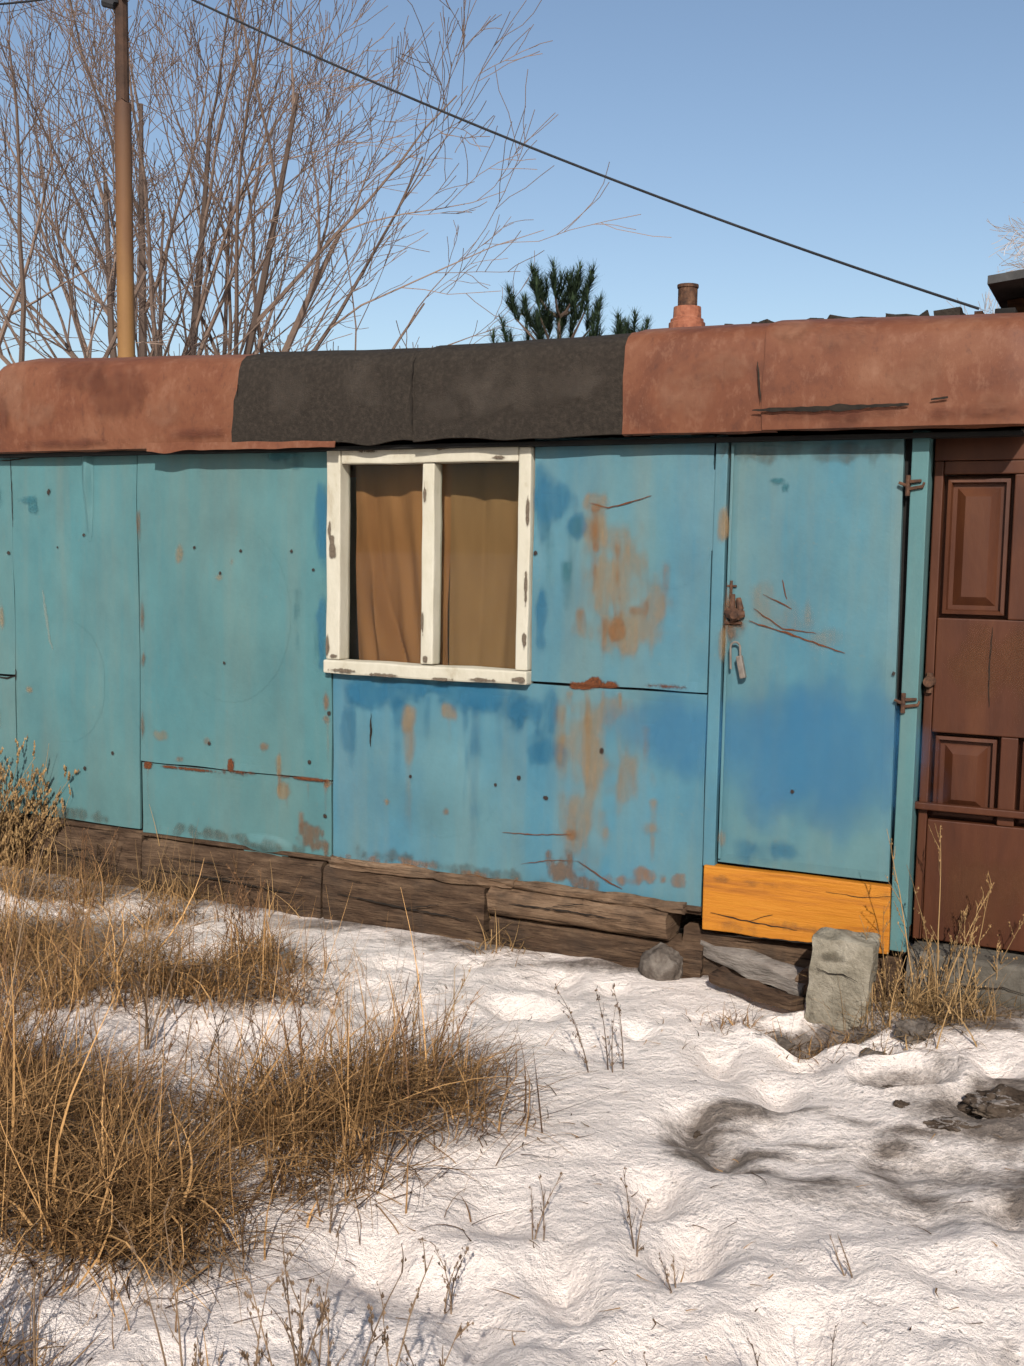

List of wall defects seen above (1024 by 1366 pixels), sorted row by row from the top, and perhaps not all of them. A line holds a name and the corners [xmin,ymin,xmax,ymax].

rust [570,677,618,690]
rust [144,758,252,774]
rust [278,760,328,794]
rust [299,814,328,856]
rust [547,852,595,890]